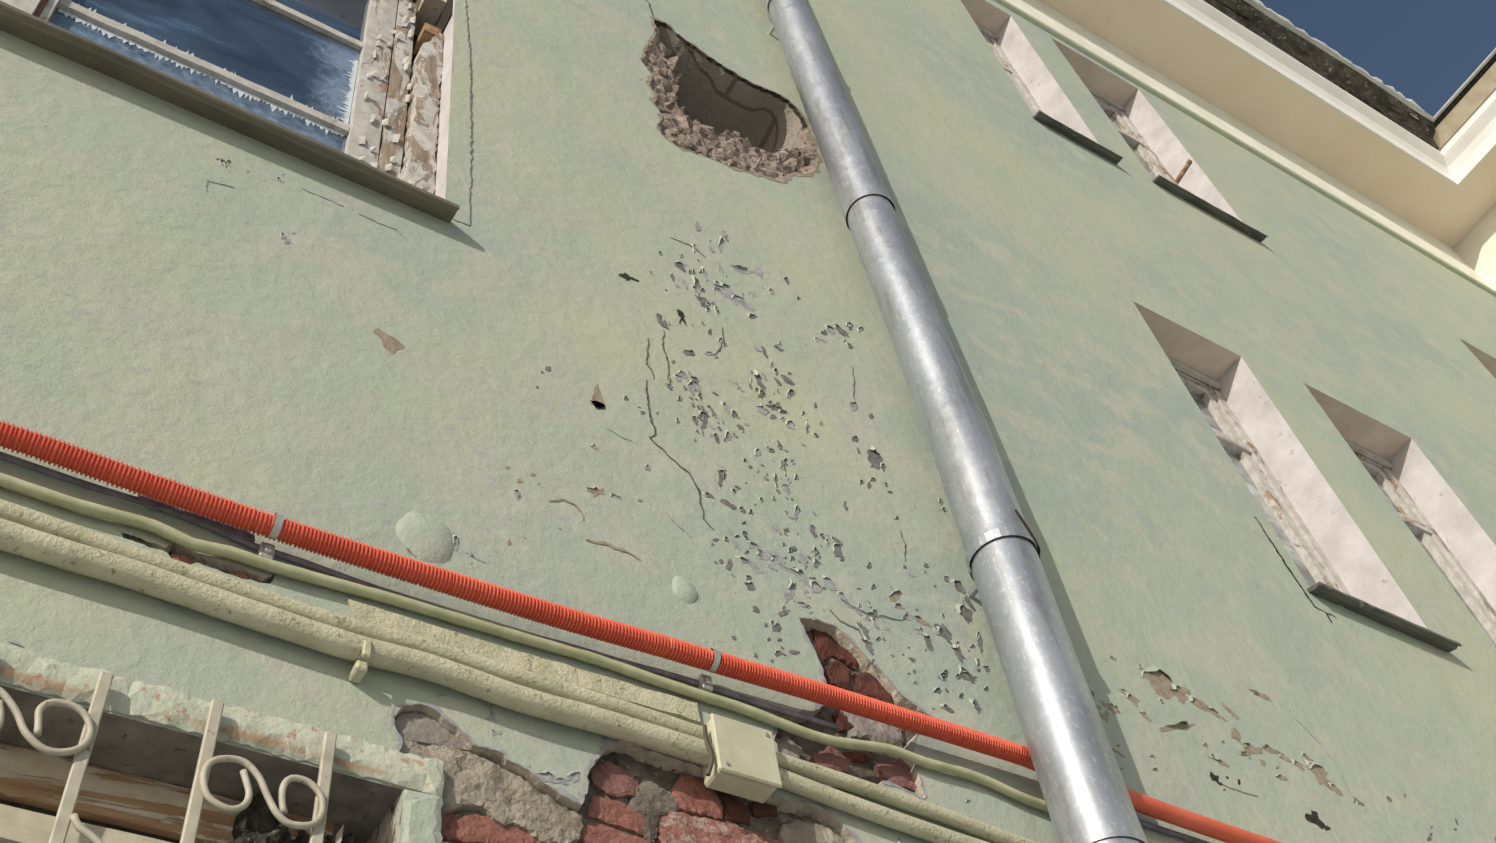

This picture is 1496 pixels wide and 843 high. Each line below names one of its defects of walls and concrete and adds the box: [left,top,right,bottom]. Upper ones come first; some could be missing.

spalling [640,16,823,183]
flaking render [373,328,405,354]
flaking render [590,383,606,409]
peeling [586,486,642,502]
crack [608,330,714,538]
flaking render [655,220,989,717]
flaking render [586,539,640,560]
crack [1255,517,1336,623]
flaking render [391,694,864,843]
flaking render [771,703,927,800]
peeling [1090,664,1364,806]
flaking render [1305,810,1331,831]